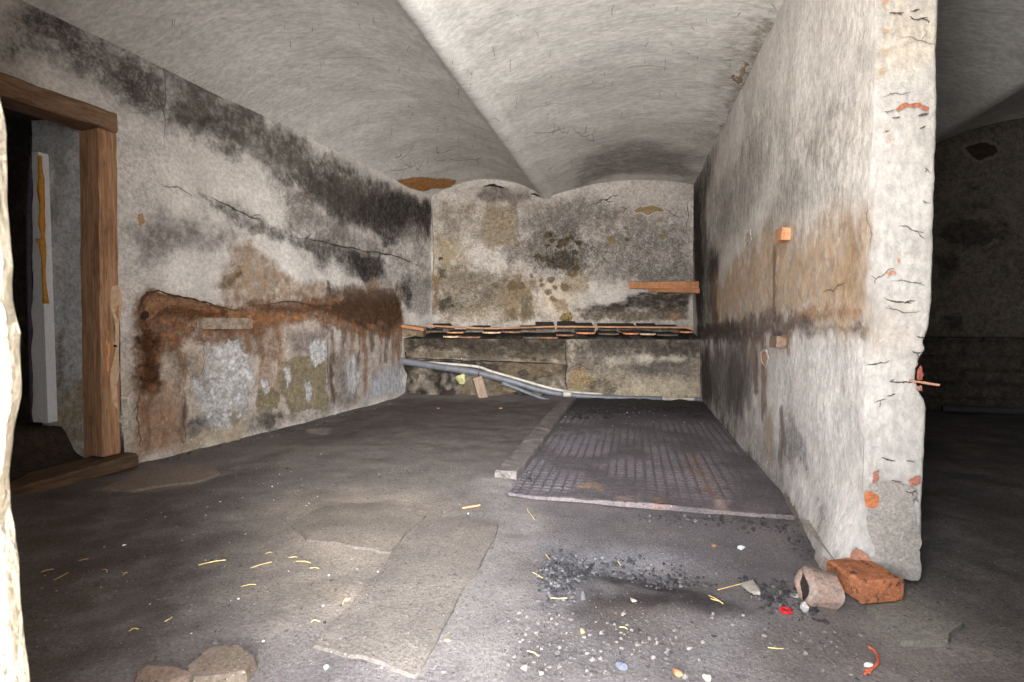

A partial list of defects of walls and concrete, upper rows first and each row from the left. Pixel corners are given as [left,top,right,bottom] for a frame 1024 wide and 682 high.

crack [890,9,936,46]
crack [884,92,929,132]
flaking render [896,102,929,111]
crack [158,182,263,221]
flaking render [396,176,457,192]
water stain [222,203,691,320]
crack [824,208,925,358]
corrosion [132,281,403,449]
water stain [697,308,827,472]
crack [868,361,912,407]
water stain [180,410,240,447]
flaking render [849,470,922,581]